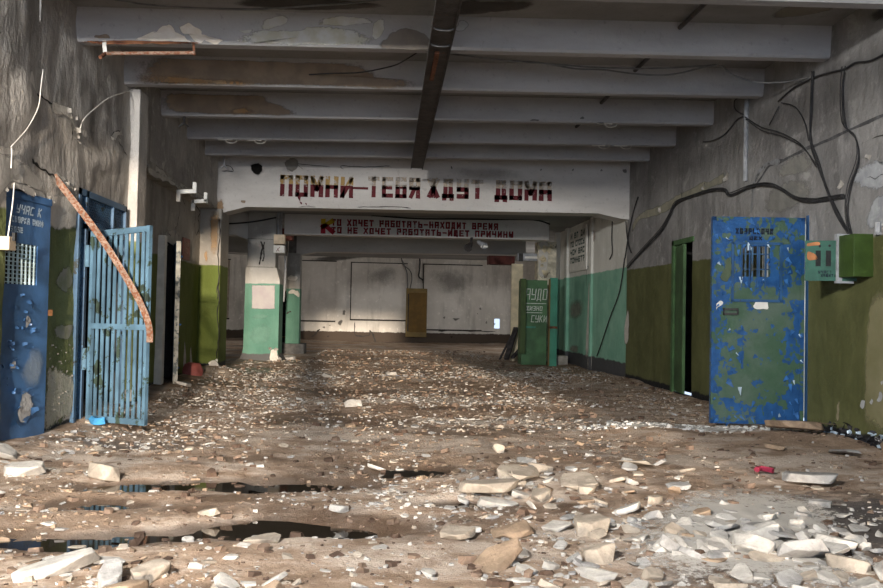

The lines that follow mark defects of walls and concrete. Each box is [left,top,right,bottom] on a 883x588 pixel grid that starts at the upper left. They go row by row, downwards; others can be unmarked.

peeling [137,23,223,44]
damp [239,0,429,50]
flaking render [837,154,883,228]
peeling [1,294,74,431]